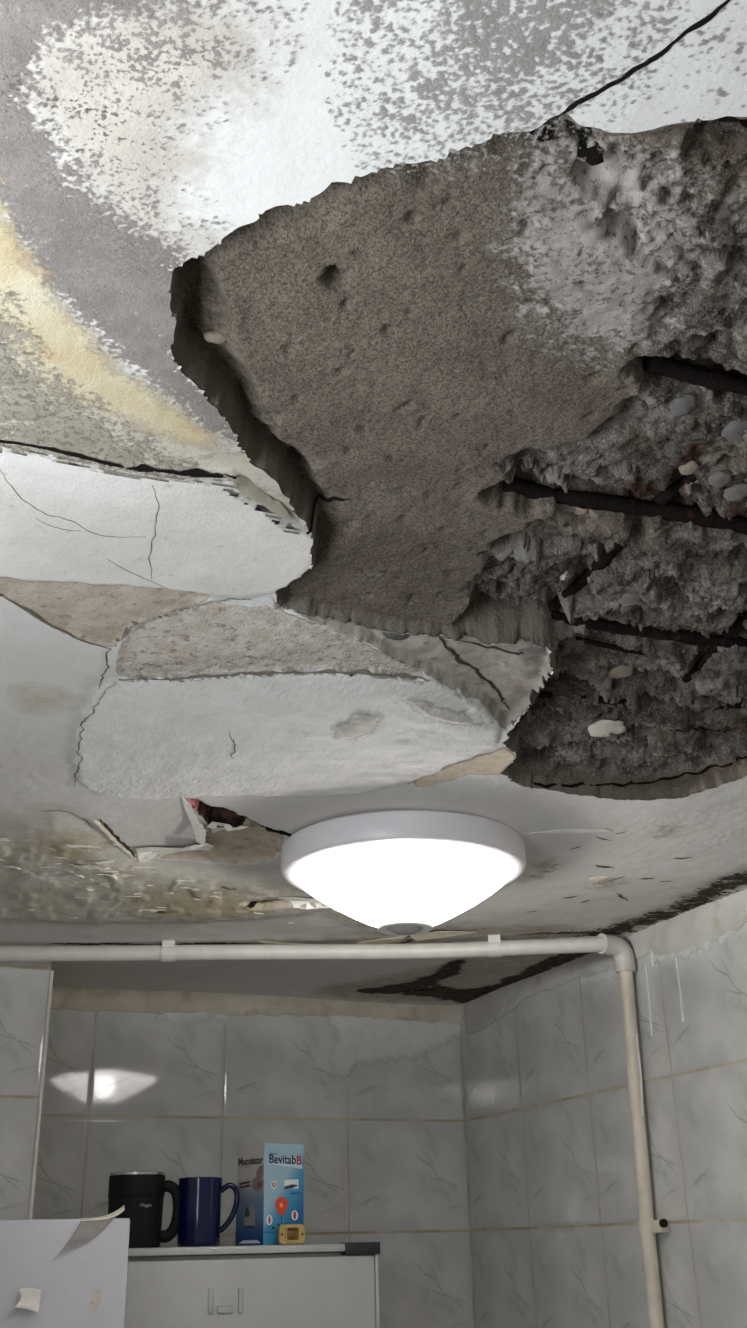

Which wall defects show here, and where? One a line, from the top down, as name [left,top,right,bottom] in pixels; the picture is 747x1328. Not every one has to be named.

crack [556,0,730,118]
leakage [0,0,308,512]
spalling [0,0,747,801]
peeling [0,798,330,922]
peeling [344,914,478,944]
leakage [356,953,588,1003]
peeling [516,931,603,939]
leakage [589,870,747,936]